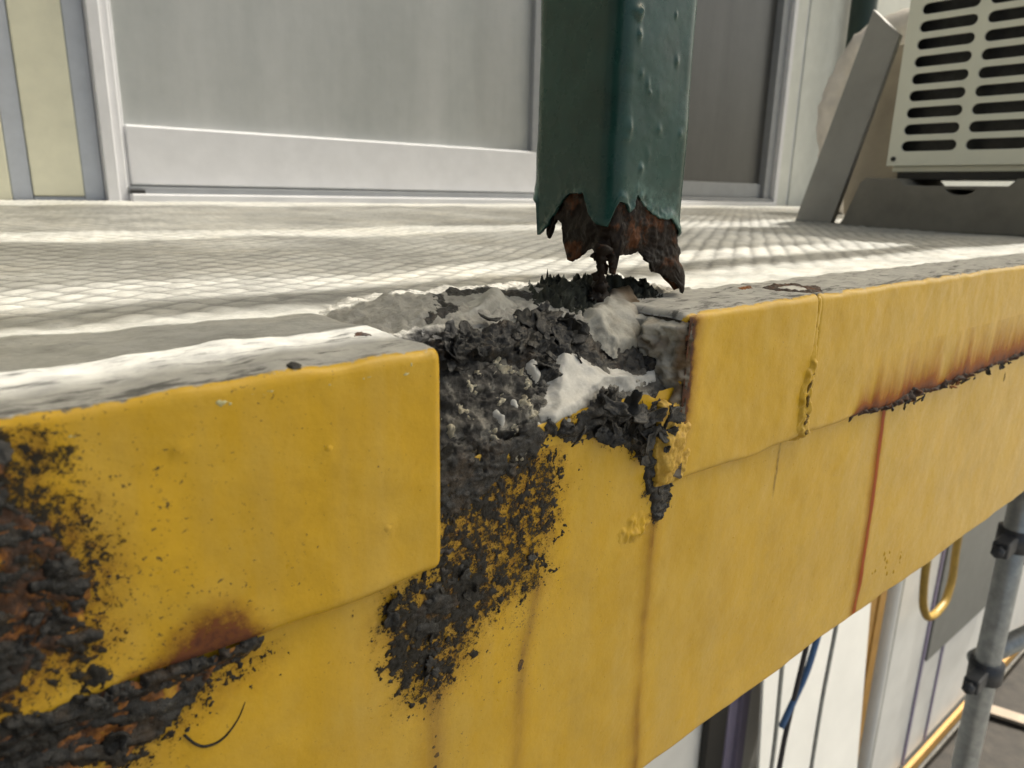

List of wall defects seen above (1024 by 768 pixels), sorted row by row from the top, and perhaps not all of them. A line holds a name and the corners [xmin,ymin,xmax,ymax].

corrosion [546,193,685,294]
corrosion [0,423,263,768]
spalling [318,272,694,722]
corrosion [556,316,699,524]
corrosion [848,336,1024,615]
peeling [100,730,132,756]